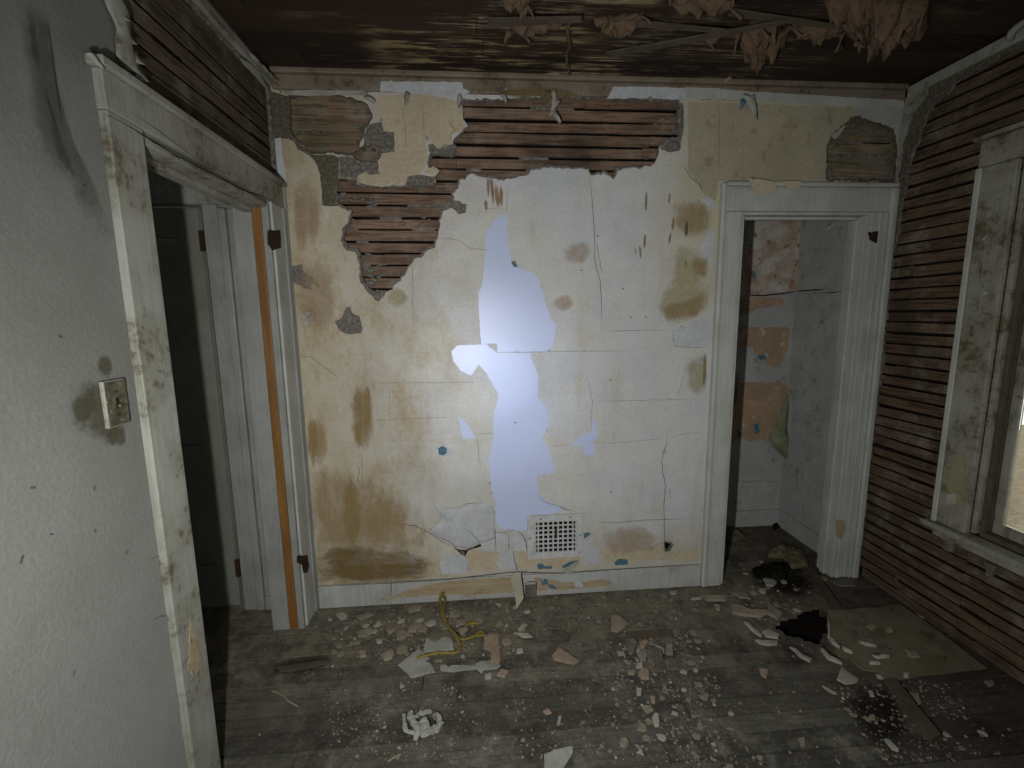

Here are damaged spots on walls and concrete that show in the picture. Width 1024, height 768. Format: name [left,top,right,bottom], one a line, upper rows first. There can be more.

flaking render [104,0,904,301]
flaking render [334,307,363,334]
flaking render [737,221,801,368]
leakage [318,481,425,581]
crack [317,374,700,596]
flaking render [731,381,788,443]